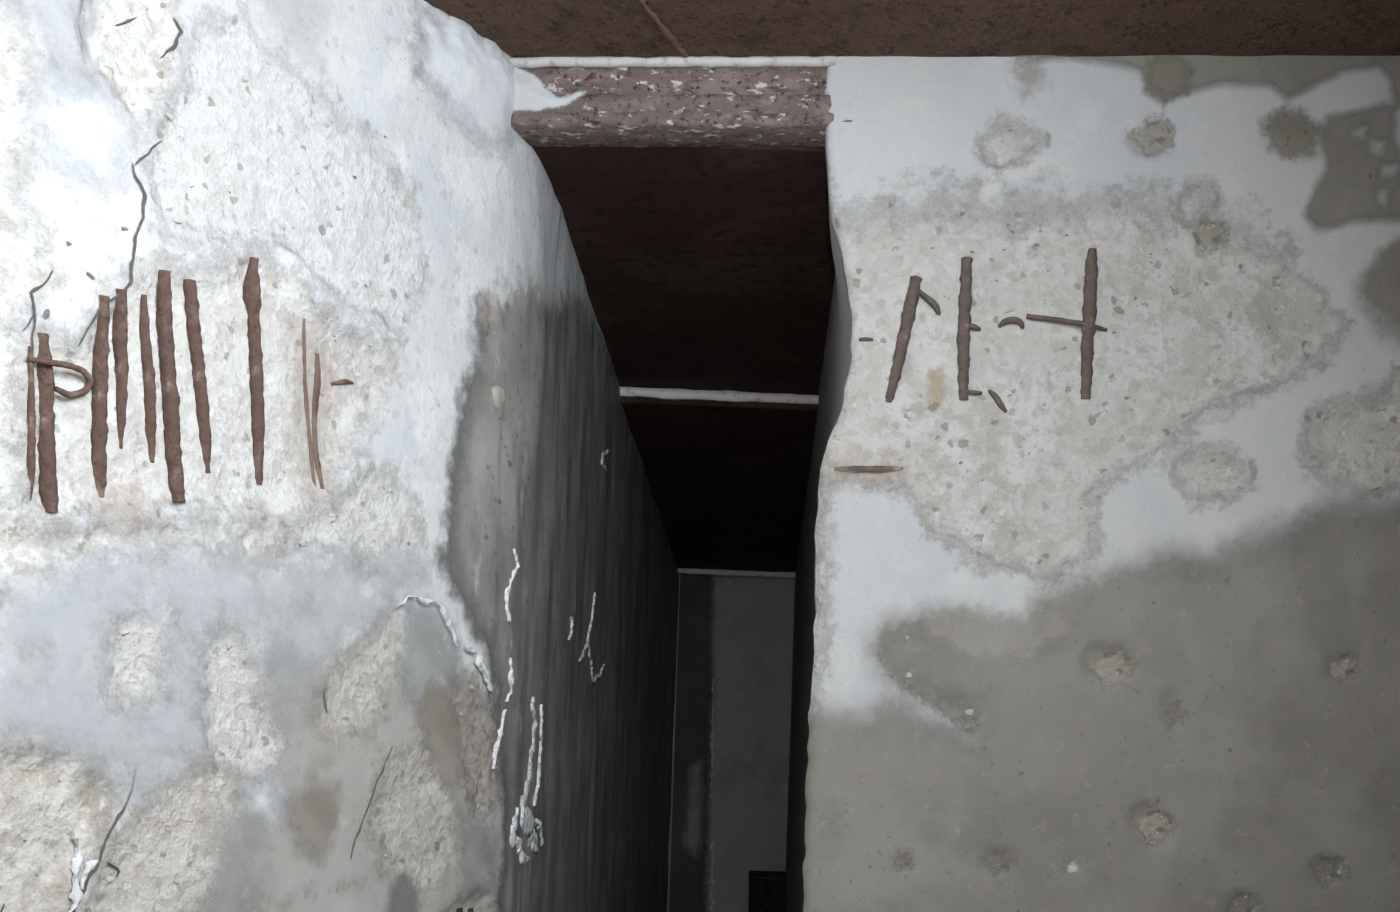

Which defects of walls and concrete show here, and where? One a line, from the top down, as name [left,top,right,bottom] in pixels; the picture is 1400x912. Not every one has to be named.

crack [23,270,53,355]
crack [79,140,163,346]
crack [161,17,184,58]
spalling [0,0,428,603]
leakage [1022,55,1400,227]
leakage [1364,242,1400,328]
spalling [808,179,1349,733]
crack [68,769,136,912]
spalling [0,609,291,912]
leakage [0,281,716,912]
spalling [362,675,498,912]
leakage [803,504,1400,912]